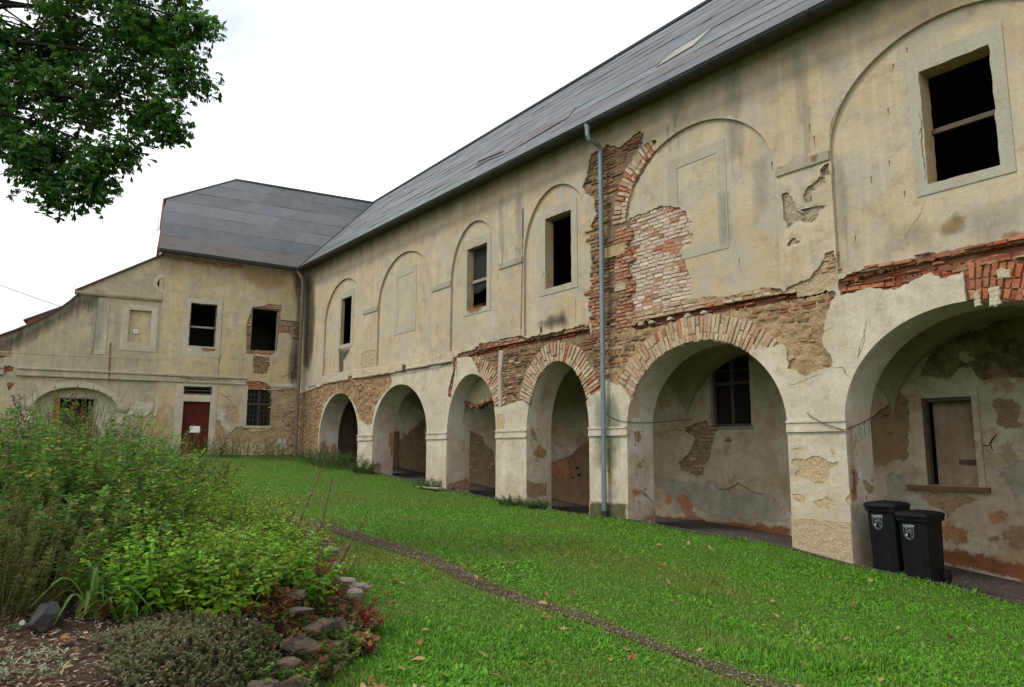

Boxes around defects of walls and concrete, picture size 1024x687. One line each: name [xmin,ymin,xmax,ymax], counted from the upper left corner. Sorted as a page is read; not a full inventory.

crack [902,118,926,242]
spalling [216,304,392,463]
leakage [538,315,565,335]
spalling [678,420,731,477]
spalling [448,131,1024,429]
spalling [791,392,978,546]